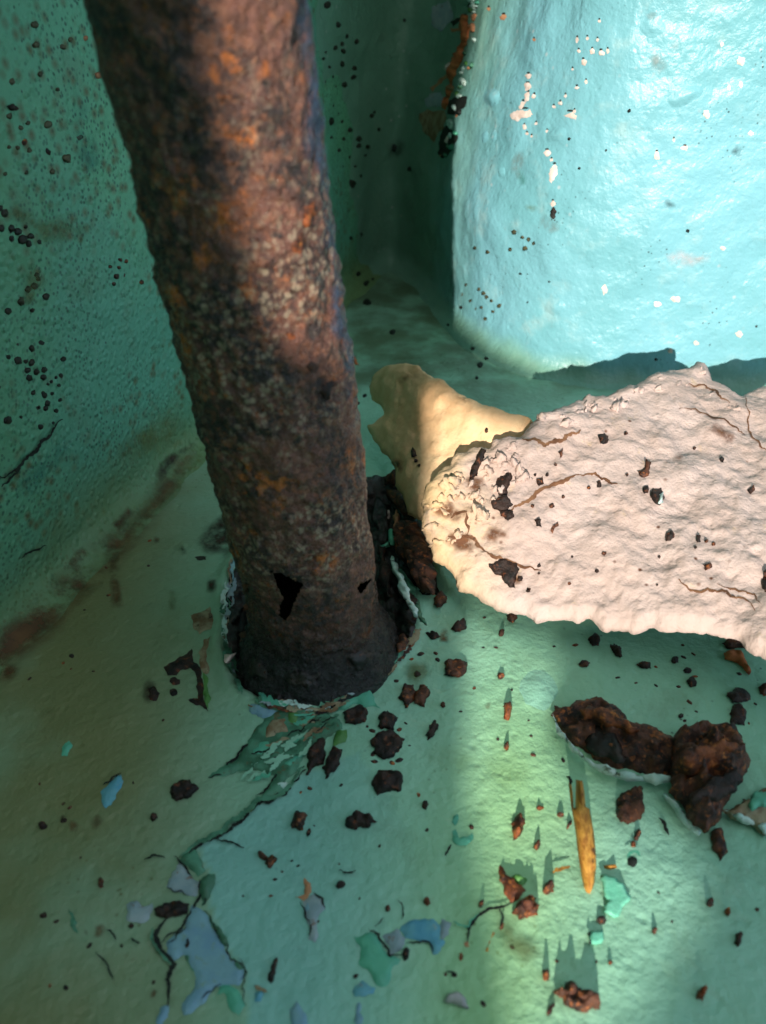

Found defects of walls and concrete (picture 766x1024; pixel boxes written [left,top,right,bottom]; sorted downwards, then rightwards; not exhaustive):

spalling [510,72,548,138]
rust [291,202,317,255]
rust [307,362,339,400]
crack [522,429,581,447]
crack [511,472,618,511]
crack [448,510,541,571]
spalling [366,475,440,675]
crack [678,579,761,610]
rust [0,607,59,677]
peeling [146,558,380,1015]
rust [616,786,645,847]
peeling [352,900,451,1024]